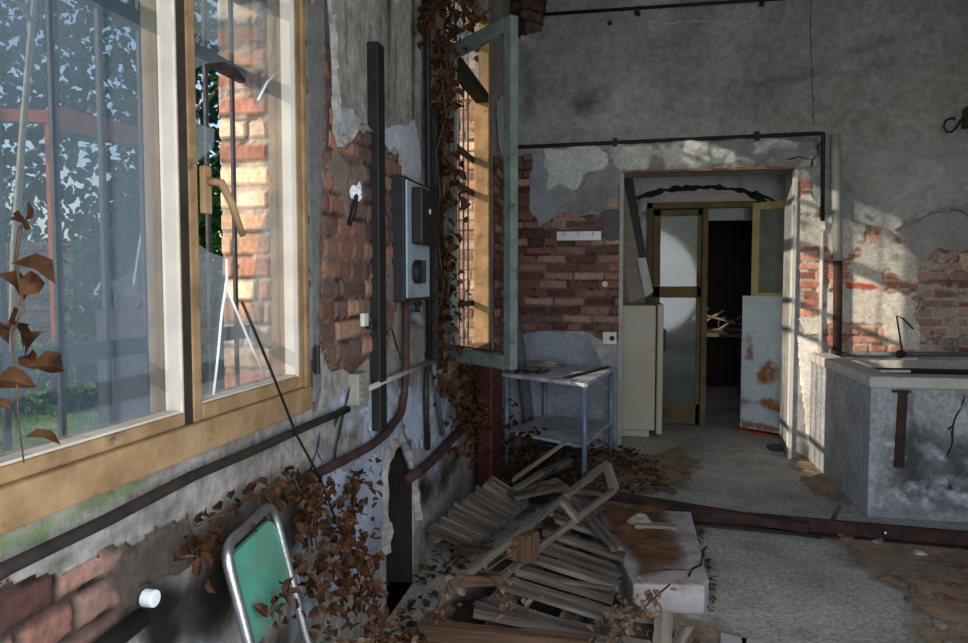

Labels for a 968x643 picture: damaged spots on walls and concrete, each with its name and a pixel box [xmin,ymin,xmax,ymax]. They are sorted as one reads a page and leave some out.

spalling [510,0,548,41]
flaking render [319,0,373,373]
flaking render [385,119,421,347]
flaking render [493,94,504,353]
flaking render [518,146,620,341]
crack [636,184,775,202]
flaking render [797,170,968,442]
rust [758,362,776,383]
rust [761,399,780,412]
damp [878,435,968,508]
crack [945,396,965,458]
flaking render [0,513,197,643]